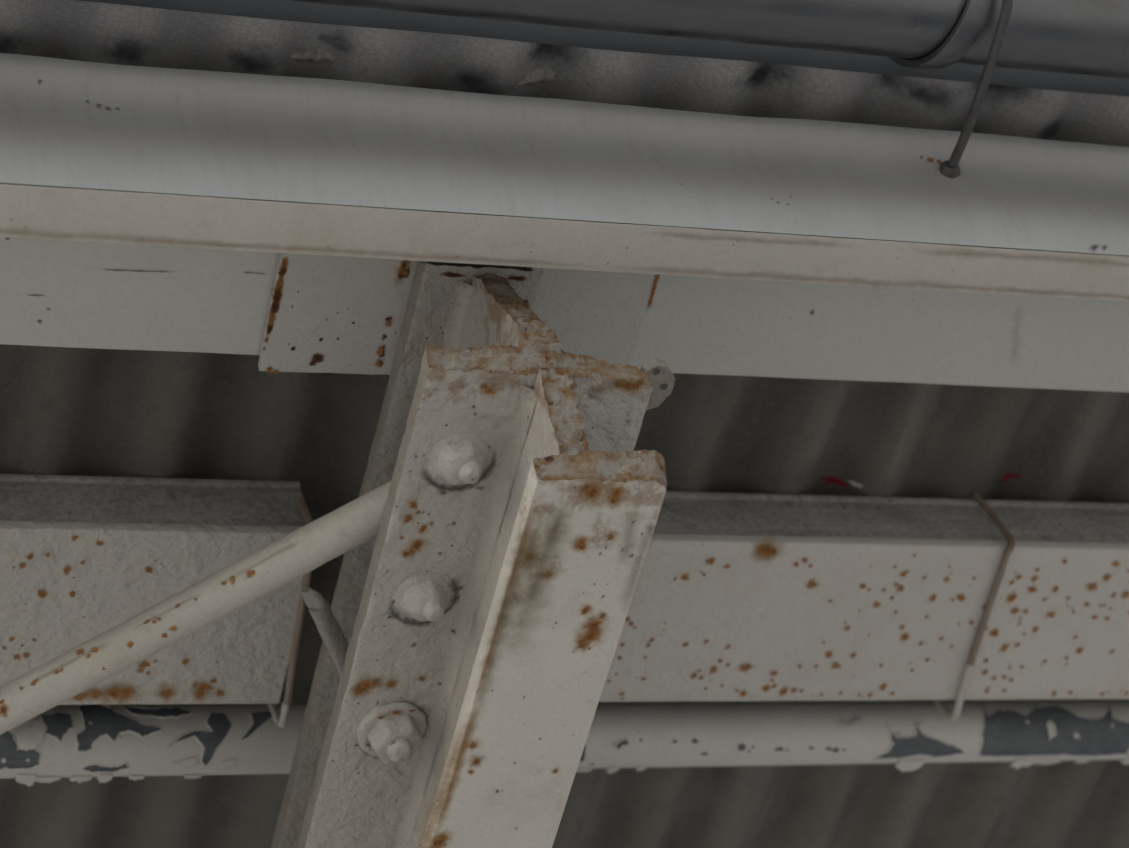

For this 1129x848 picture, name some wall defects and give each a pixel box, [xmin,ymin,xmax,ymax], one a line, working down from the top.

corrosion [398,260,409,281]
corrosion [263,258,287,350]
corrosion [310,338,323,366]
corrosion [375,317,392,367]
corrosion [401,503,432,556]
corrosion [578,607,605,648]
corrosion [860,565,926,645]
corrosion [958,561,1129,693]
corrosion [691,645,752,697]
peeling [0,704,281,787]
peeling [576,743,621,774]
peeling [871,704,1129,772]